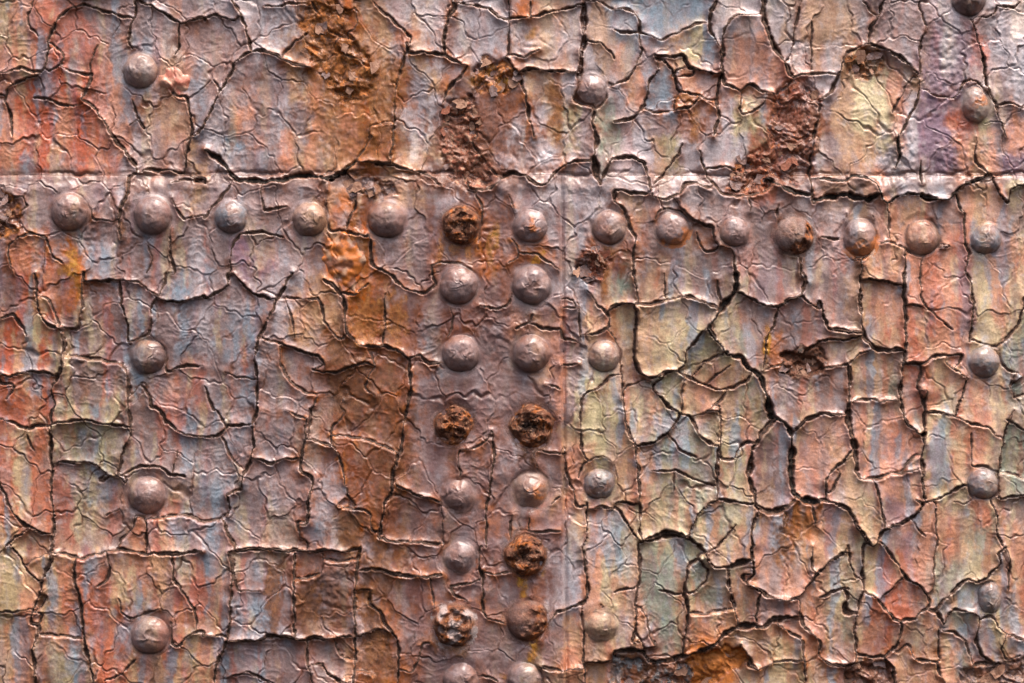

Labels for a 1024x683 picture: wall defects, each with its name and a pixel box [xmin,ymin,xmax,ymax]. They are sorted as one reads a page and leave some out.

crack [0,0,310,239]
corrosion [296,0,398,122]
corrosion [411,64,514,196]
crack [172,0,779,220]
spalling [440,55,525,191]
corrosion [769,95,810,152]
crack [328,193,461,294]
crack [461,0,1024,683]
spalling [779,343,826,379]
crack [0,231,510,683]